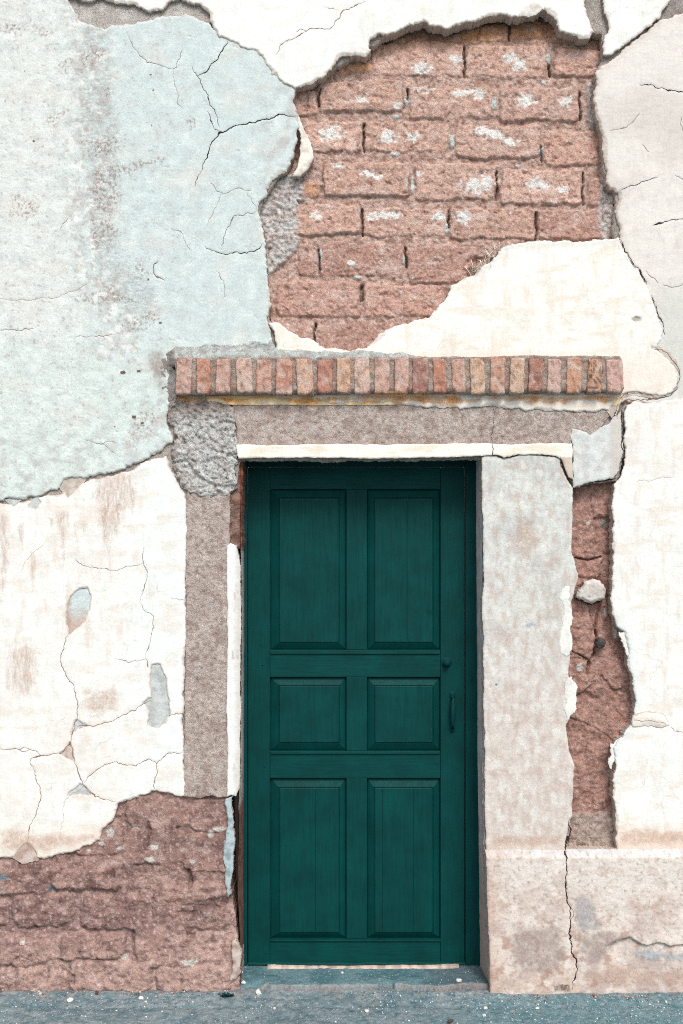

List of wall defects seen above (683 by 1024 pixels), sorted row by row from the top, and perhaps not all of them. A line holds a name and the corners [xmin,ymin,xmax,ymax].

crack [131,42,294,295]
spalling [260,1,614,351]
peeling [66,588,91,634]
peeling [69,784,91,796]
crack [5,635,178,845]
peeling [144,664,170,728]
spalling [559,482,632,847]
spalling [0,791,244,992]
crack [564,819,578,981]